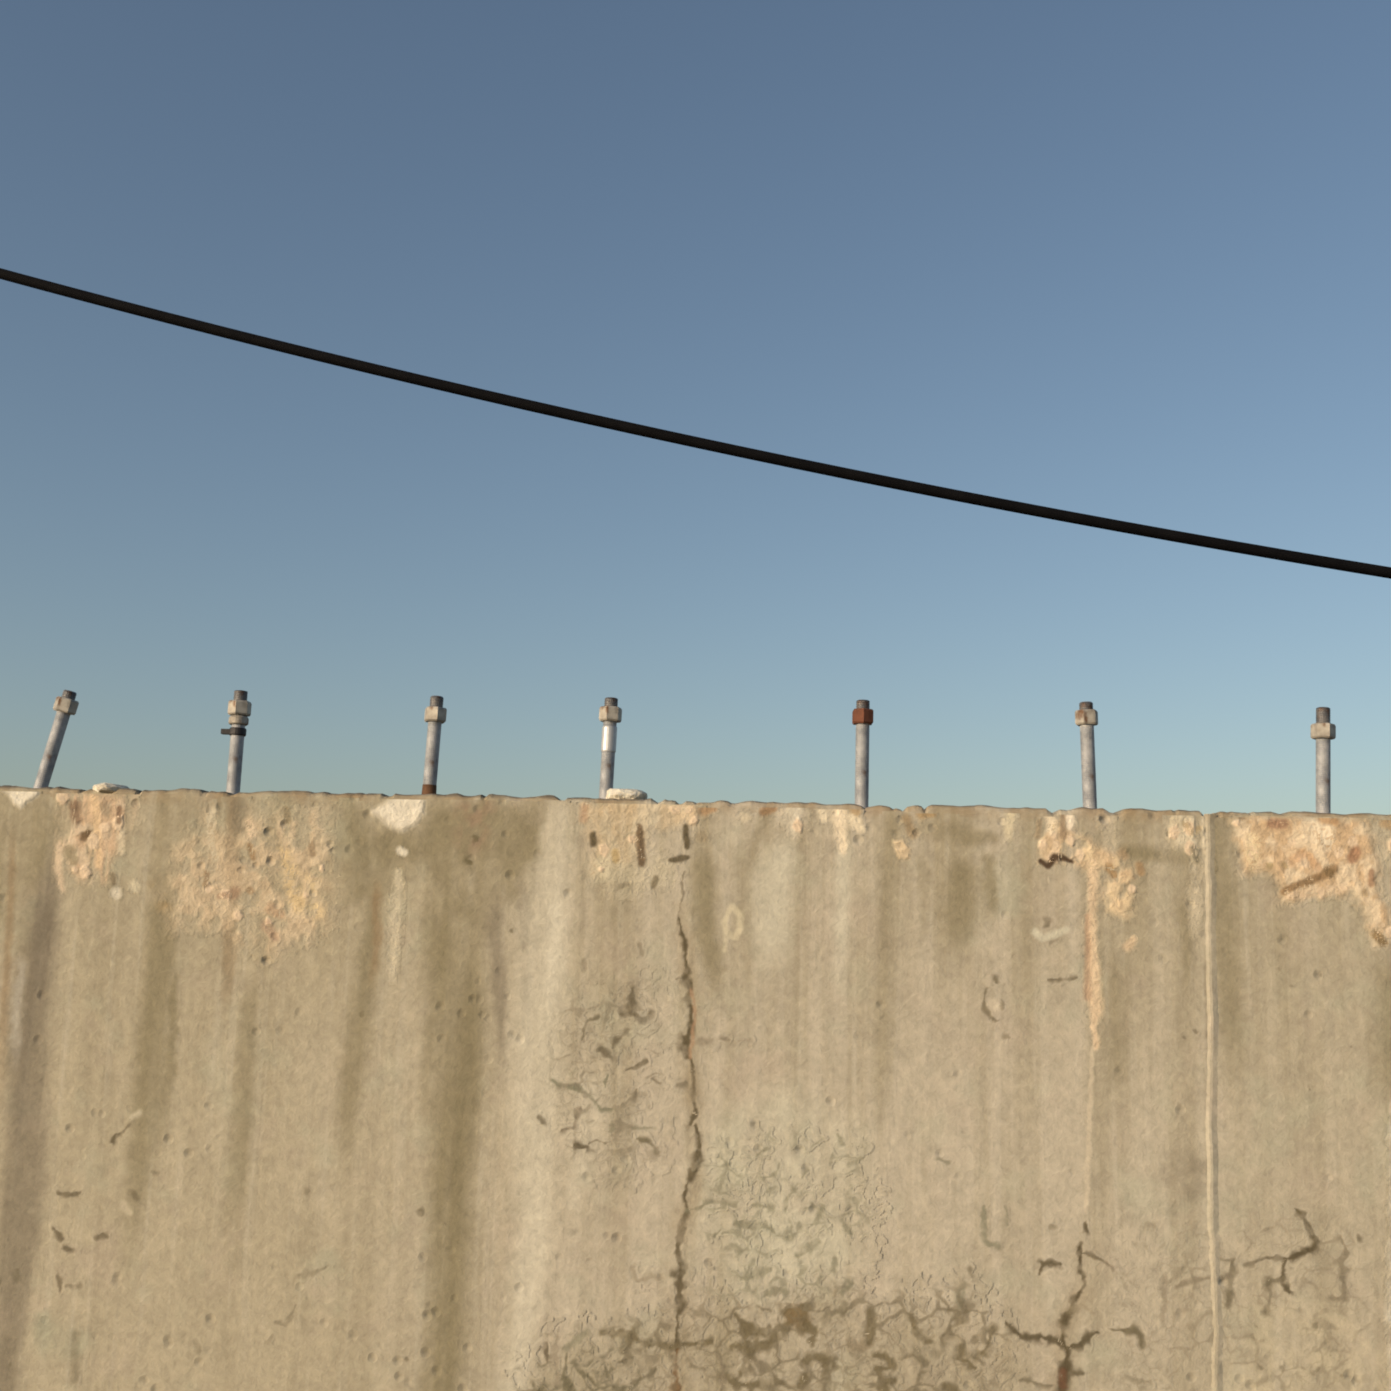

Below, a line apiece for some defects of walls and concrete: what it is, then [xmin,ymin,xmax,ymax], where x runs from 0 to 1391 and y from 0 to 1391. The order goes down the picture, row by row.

water stain [0,790,94,1391]
water stain [110,863,188,1302]
spalling [50,783,346,968]
water stain [214,940,265,1278]
crack [501,869,1386,1391]
spalling [997,813,1147,1053]
spalling [1162,815,1391,952]